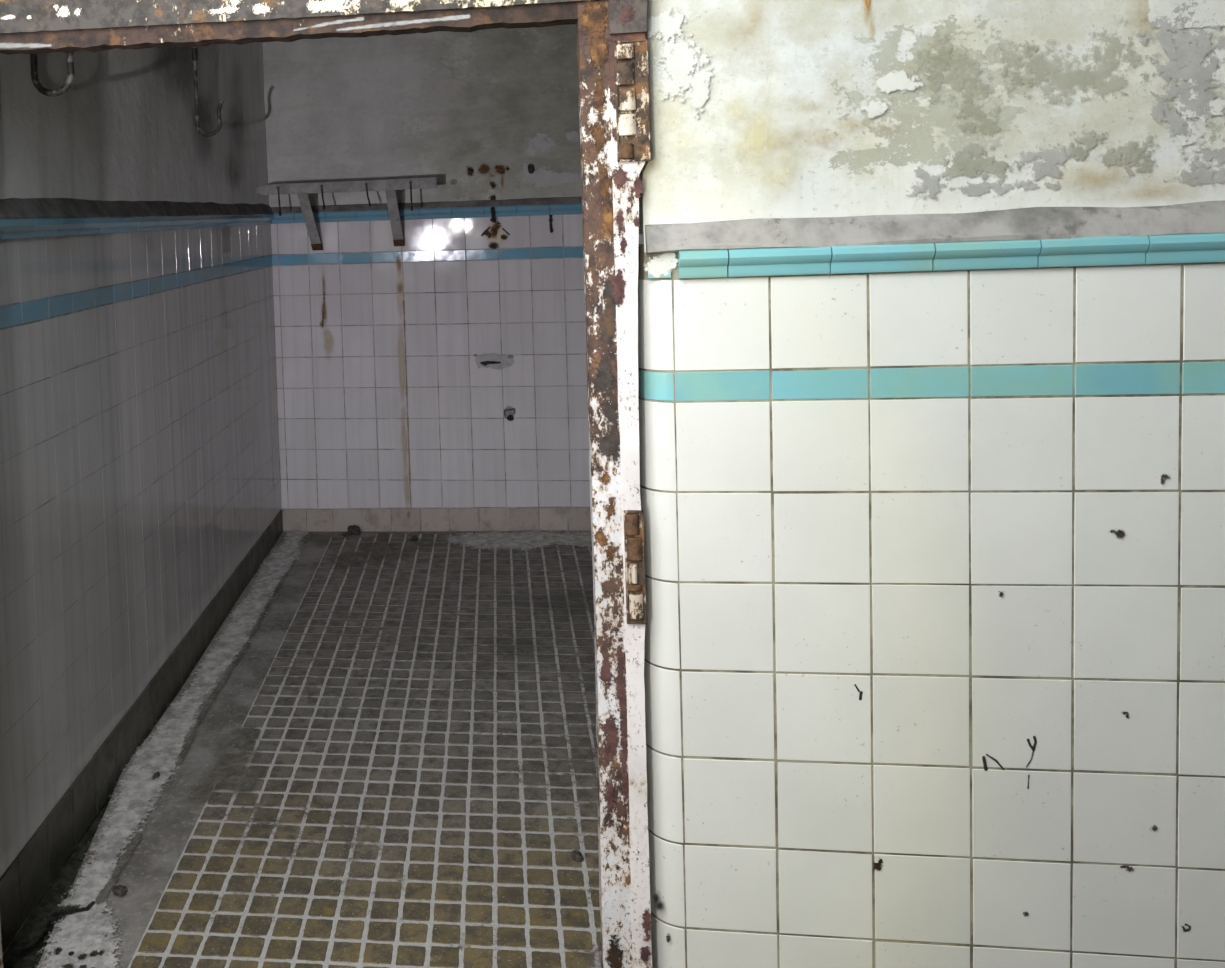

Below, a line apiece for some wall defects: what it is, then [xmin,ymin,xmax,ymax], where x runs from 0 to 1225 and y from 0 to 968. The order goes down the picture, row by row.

corrosion [53,4,82,21]
corrosion [203,0,273,16]
corrosion [306,0,360,14]
peeling [858,0,1225,200]
corrosion [450,163,510,200]
corrosion [481,217,510,249]
corrosion [320,279,332,350]
corrosion [594,532,617,562]
corrosion [597,615,629,832]
corrosion [605,931,624,968]
corrosion [640,908,652,962]